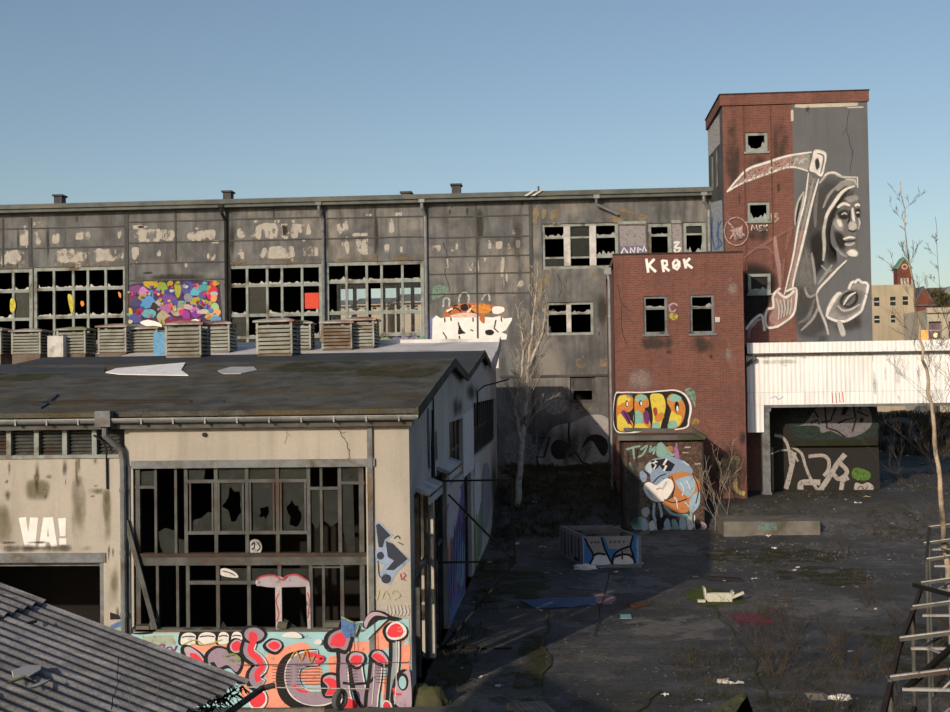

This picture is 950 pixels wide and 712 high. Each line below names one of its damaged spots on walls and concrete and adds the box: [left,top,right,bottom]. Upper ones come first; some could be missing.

peeling [0,222,219,267]
peeling [237,220,318,261]
peeling [337,221,368,255]
peeling [384,212,403,253]
water stain [28,472,50,497]
water stain [91,485,109,521]
water stain [0,511,68,551]